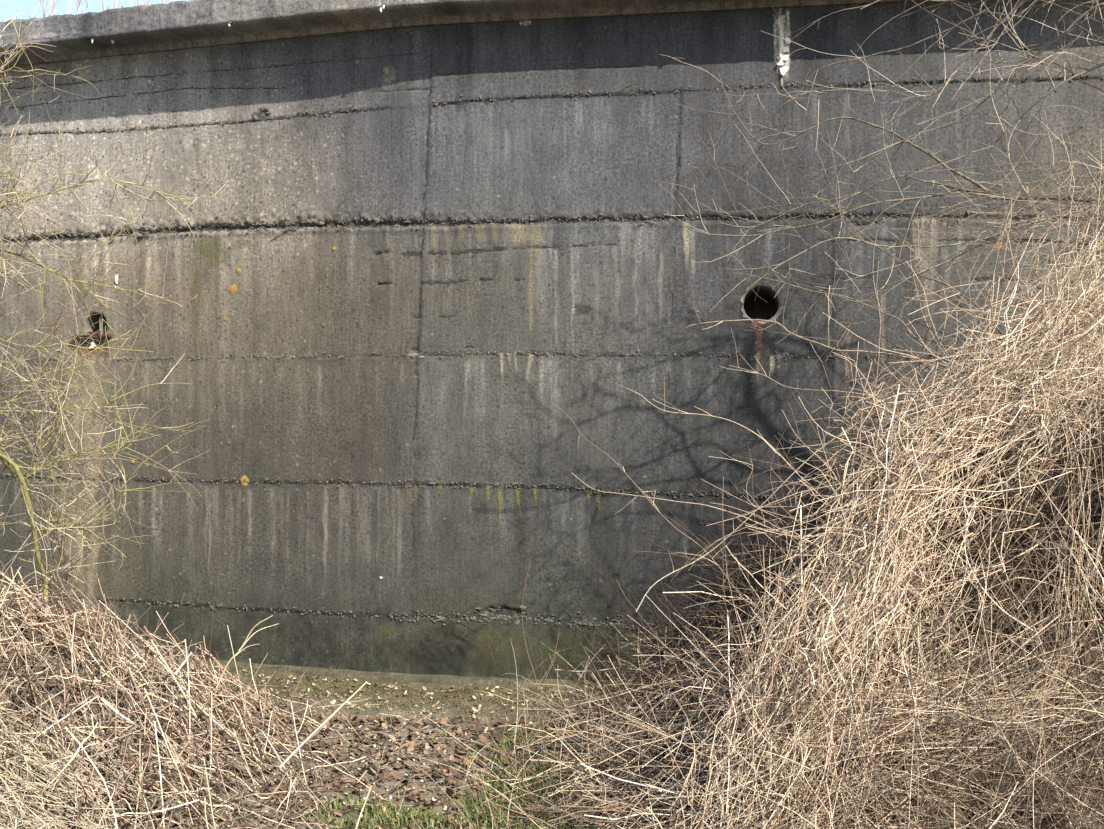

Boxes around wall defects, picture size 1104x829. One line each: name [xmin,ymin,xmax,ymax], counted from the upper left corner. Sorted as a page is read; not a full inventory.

water stain [774,8,791,85]
water stain [460,224,540,325]
water stain [500,353,533,380]
rust [754,320,764,379]